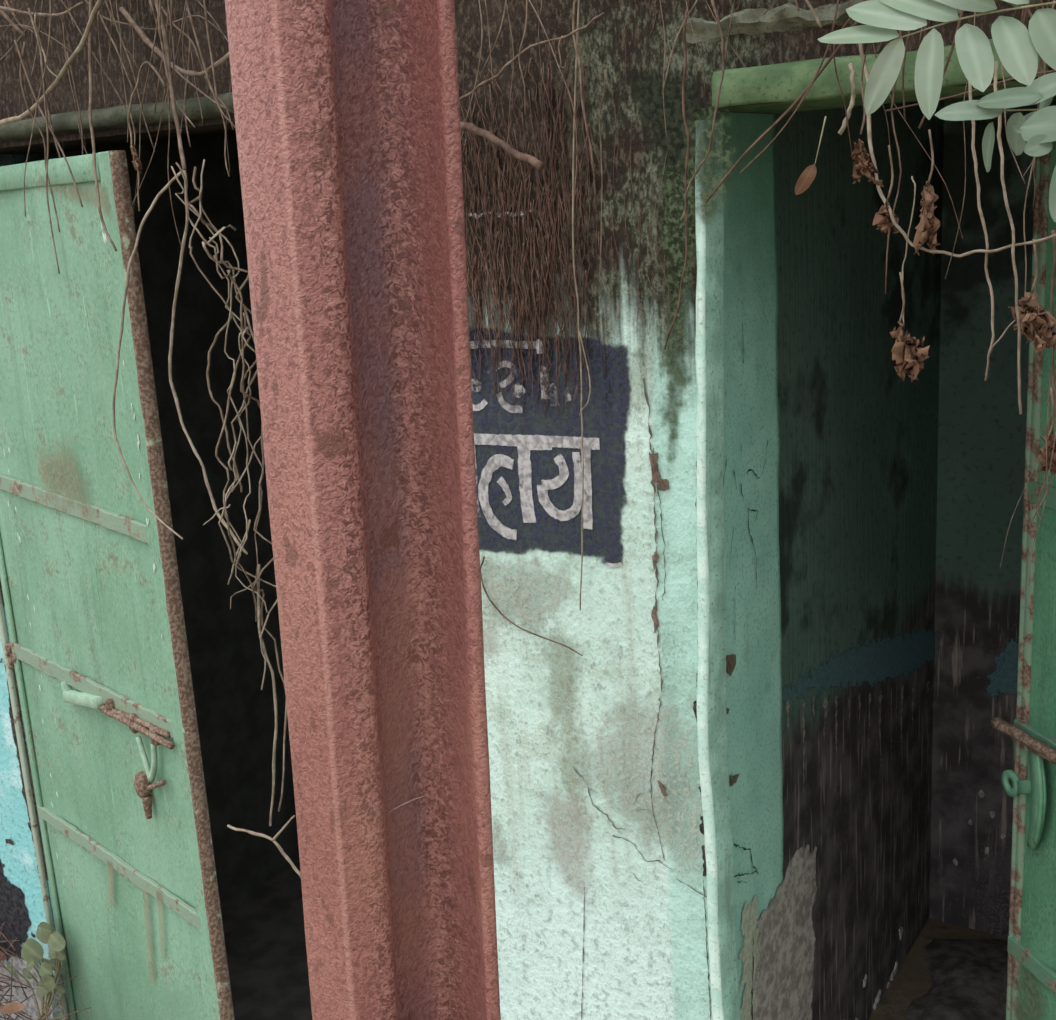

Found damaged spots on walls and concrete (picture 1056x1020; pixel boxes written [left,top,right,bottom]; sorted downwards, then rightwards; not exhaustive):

crack [642,378,654,454]
flaking render [649,452,670,491]
crack [723,441,768,588]
flaking render [651,606,659,634]
spalling [5,668,58,881]
leakage [551,637,704,870]
crack [573,479,711,1020]
peeling [0,861,54,1020]
crack [734,843,758,883]
peeling [738,844,817,1020]